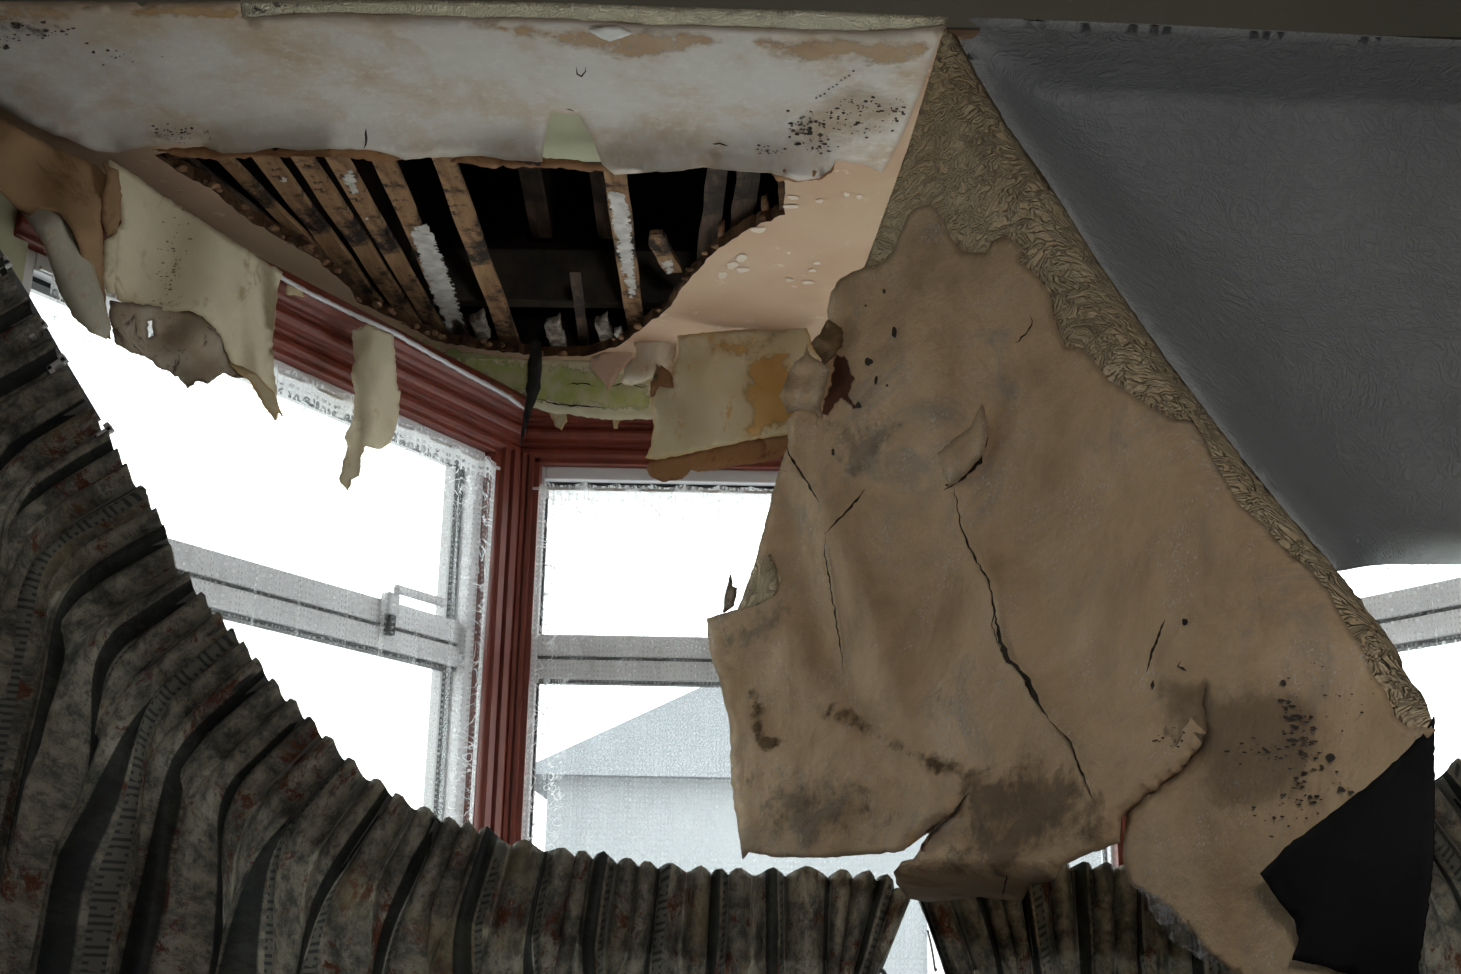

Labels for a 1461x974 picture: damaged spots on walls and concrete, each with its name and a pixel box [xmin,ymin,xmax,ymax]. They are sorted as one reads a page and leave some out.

water stain [756,40,927,154]
spalling [239,204,447,340]
peeling [612,244,719,386]
spalling [759,181,785,221]
crack [954,490,1092,798]
water stain [1224,677,1355,838]